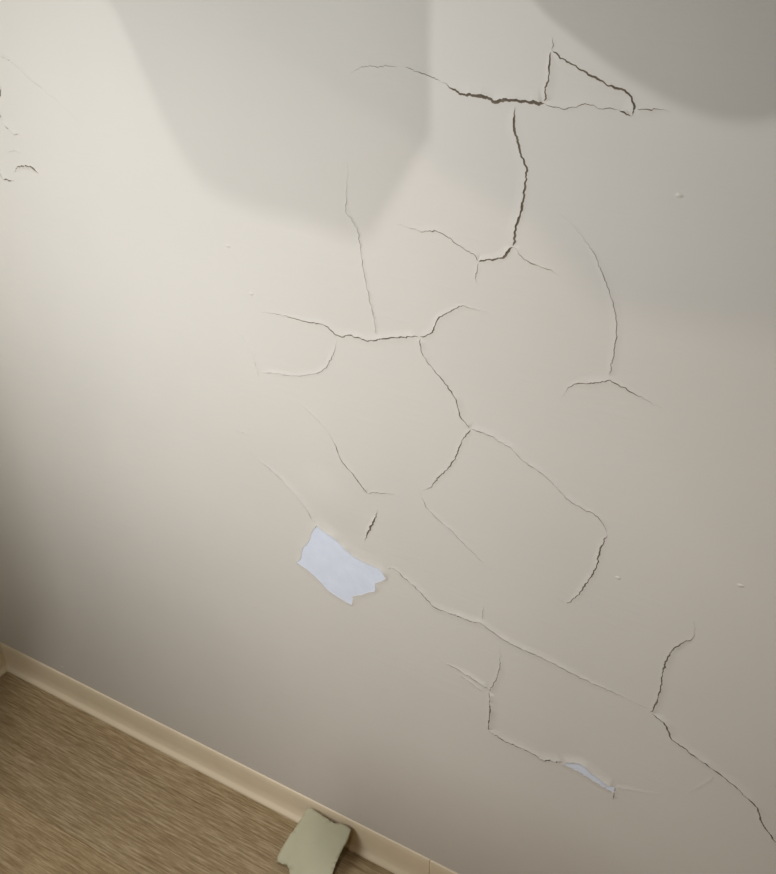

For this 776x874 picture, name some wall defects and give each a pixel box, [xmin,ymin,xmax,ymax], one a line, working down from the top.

crack [398,106,561,285]
crack [236,163,609,604]
crack [558,210,662,409]
peeling [248,451,390,607]
peeling [439,647,663,800]
crack [387,566,776,847]